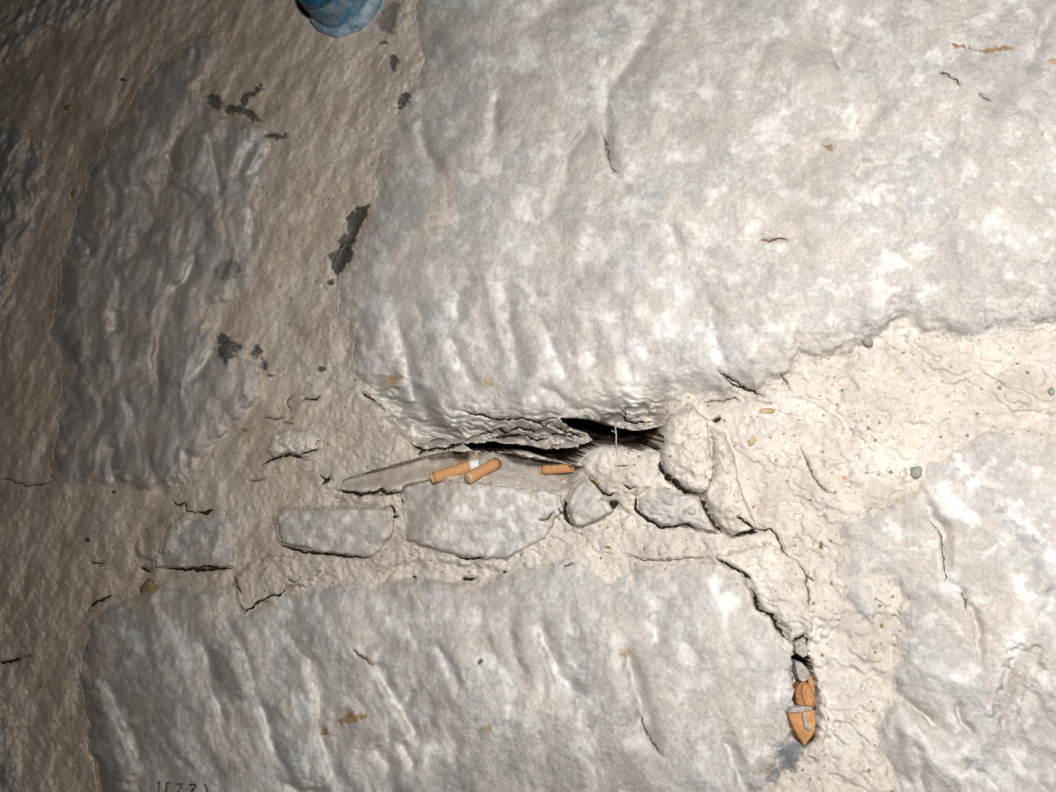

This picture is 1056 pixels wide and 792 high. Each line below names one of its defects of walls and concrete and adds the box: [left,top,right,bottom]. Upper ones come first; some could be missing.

crack [411,410,585,455]
spalling [464,418,664,465]
crack [623,411,651,424]
crack [704,372,791,423]
crack [800,447,832,493]
crack [537,499,573,525]
crack [457,556,506,581]
crack [589,461,814,644]
crack [640,715,664,757]